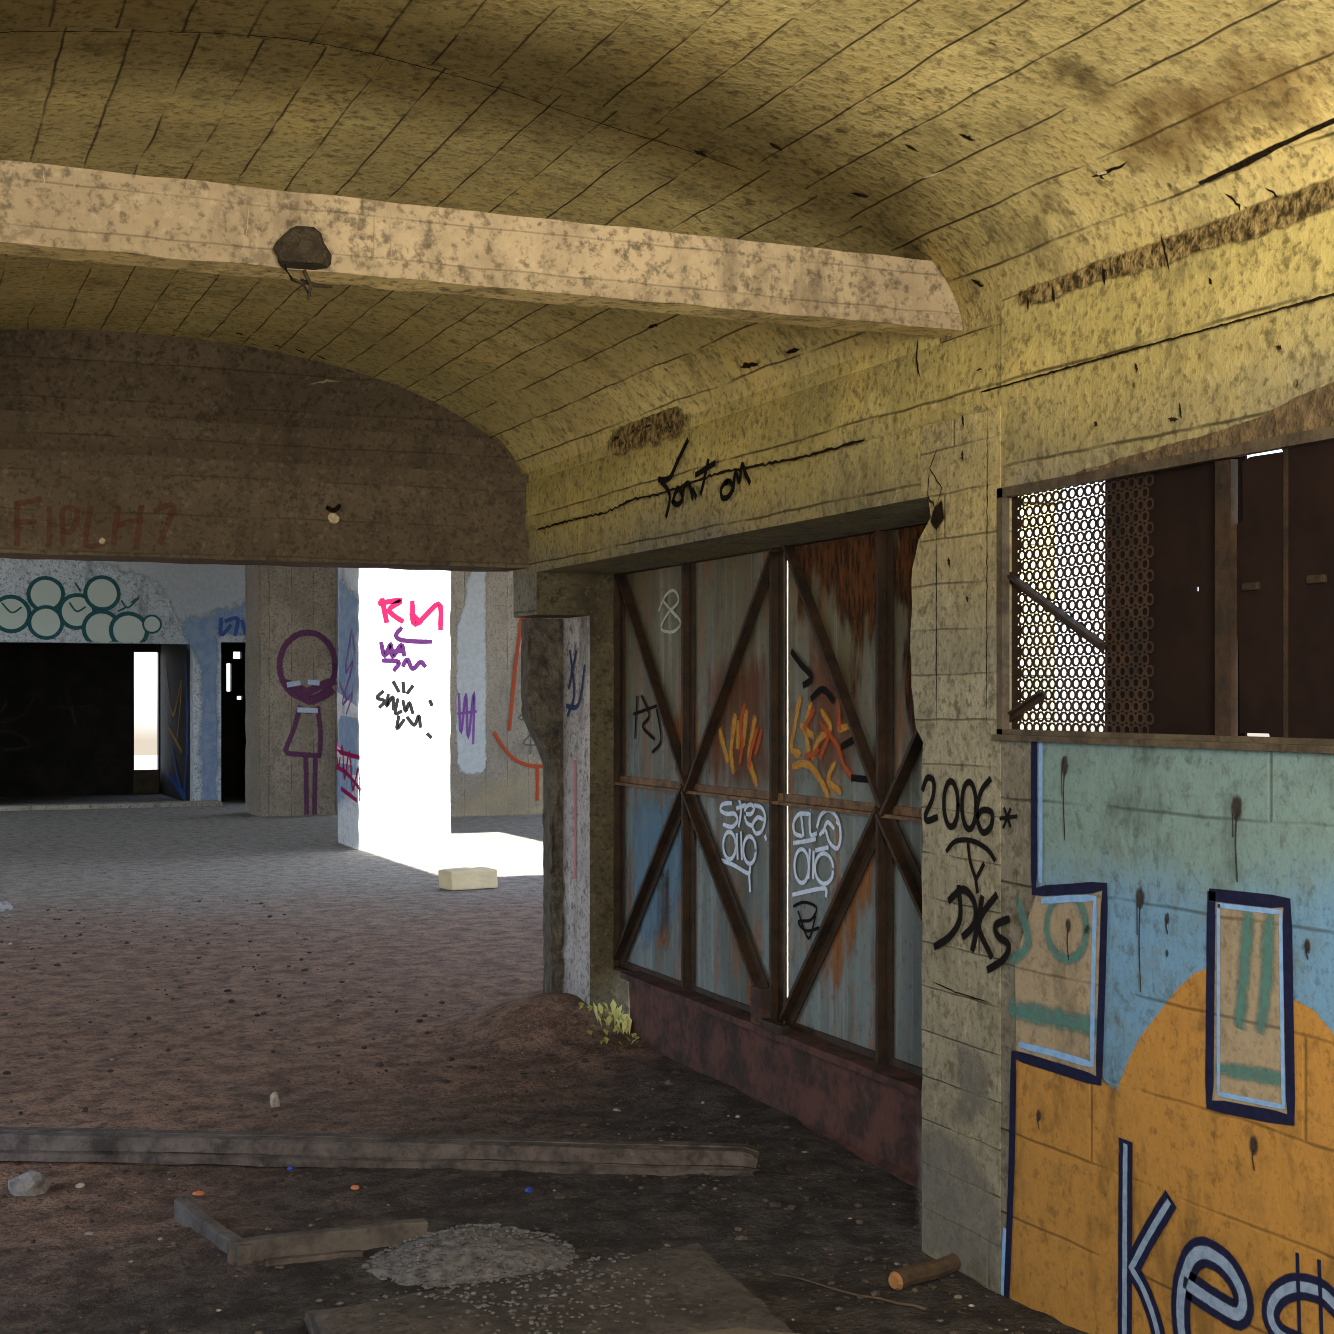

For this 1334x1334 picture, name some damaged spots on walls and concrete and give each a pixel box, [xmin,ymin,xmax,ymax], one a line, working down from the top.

spalling [1092,162,1126,179]
crack [1198,118,1334,210]
spalling [1019,177,1334,305]
spalling [608,406,687,456]
corrosion [796,533,876,704]
corrosion [894,525,926,734]
corrosion [674,663,765,779]
corrosion [810,656,848,762]
corrosion [832,863,871,984]